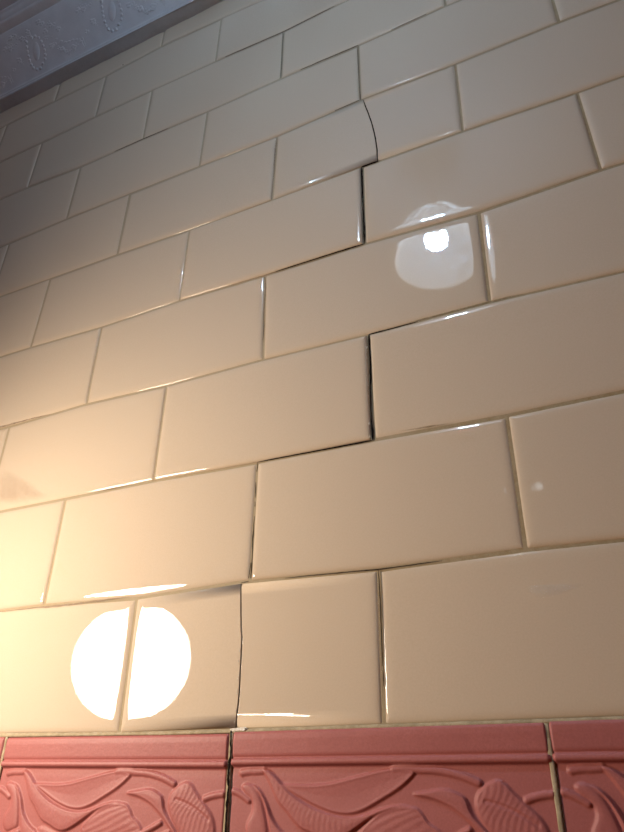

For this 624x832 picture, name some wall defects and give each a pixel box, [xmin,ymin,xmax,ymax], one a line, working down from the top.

crack [226,6,378,336]
crack [241,321,418,583]
crack [224,604,243,832]
crack [289,561,438,686]